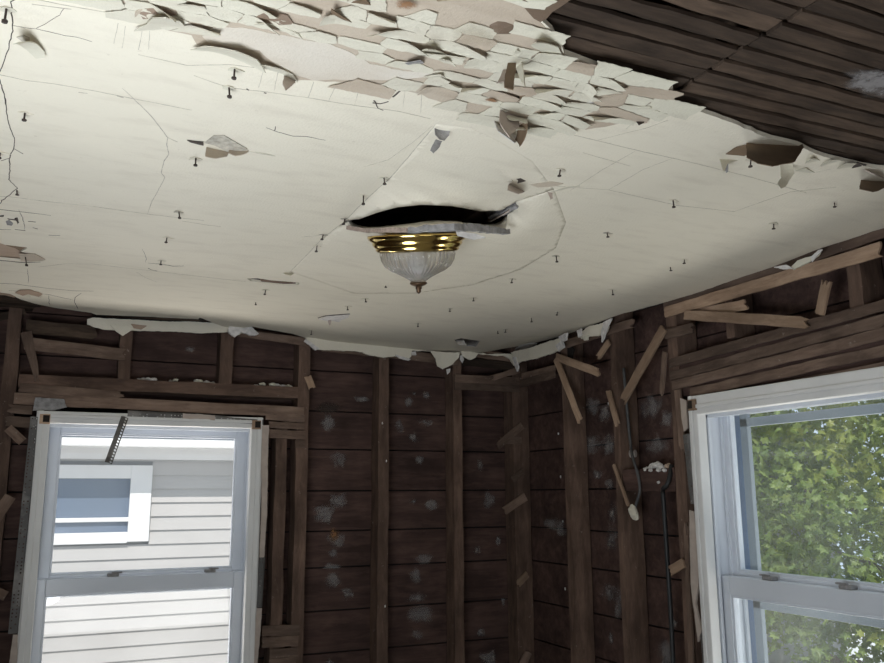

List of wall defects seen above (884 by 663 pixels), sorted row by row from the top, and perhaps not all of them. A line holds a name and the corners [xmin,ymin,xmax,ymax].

peeling [56,0,706,147]
crack [0,0,433,271]
peeling [187,135,274,156]
peeling [719,142,815,189]
peeling [837,162,884,192]
peeling [0,243,45,263]